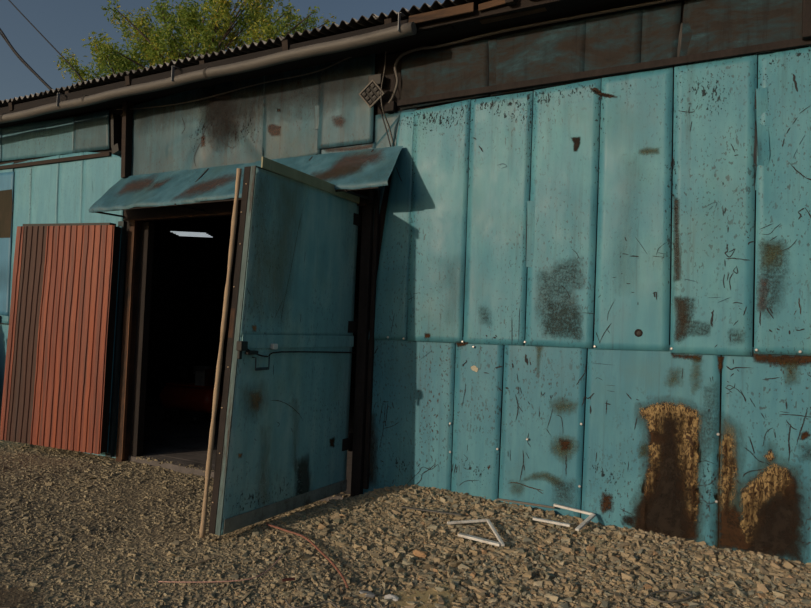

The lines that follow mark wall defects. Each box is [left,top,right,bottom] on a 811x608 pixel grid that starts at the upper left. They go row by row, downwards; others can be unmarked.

rust [554,439,573,456]
rust [600,494,614,512]
rust [622,402,700,541]
rust [717,426,802,560]